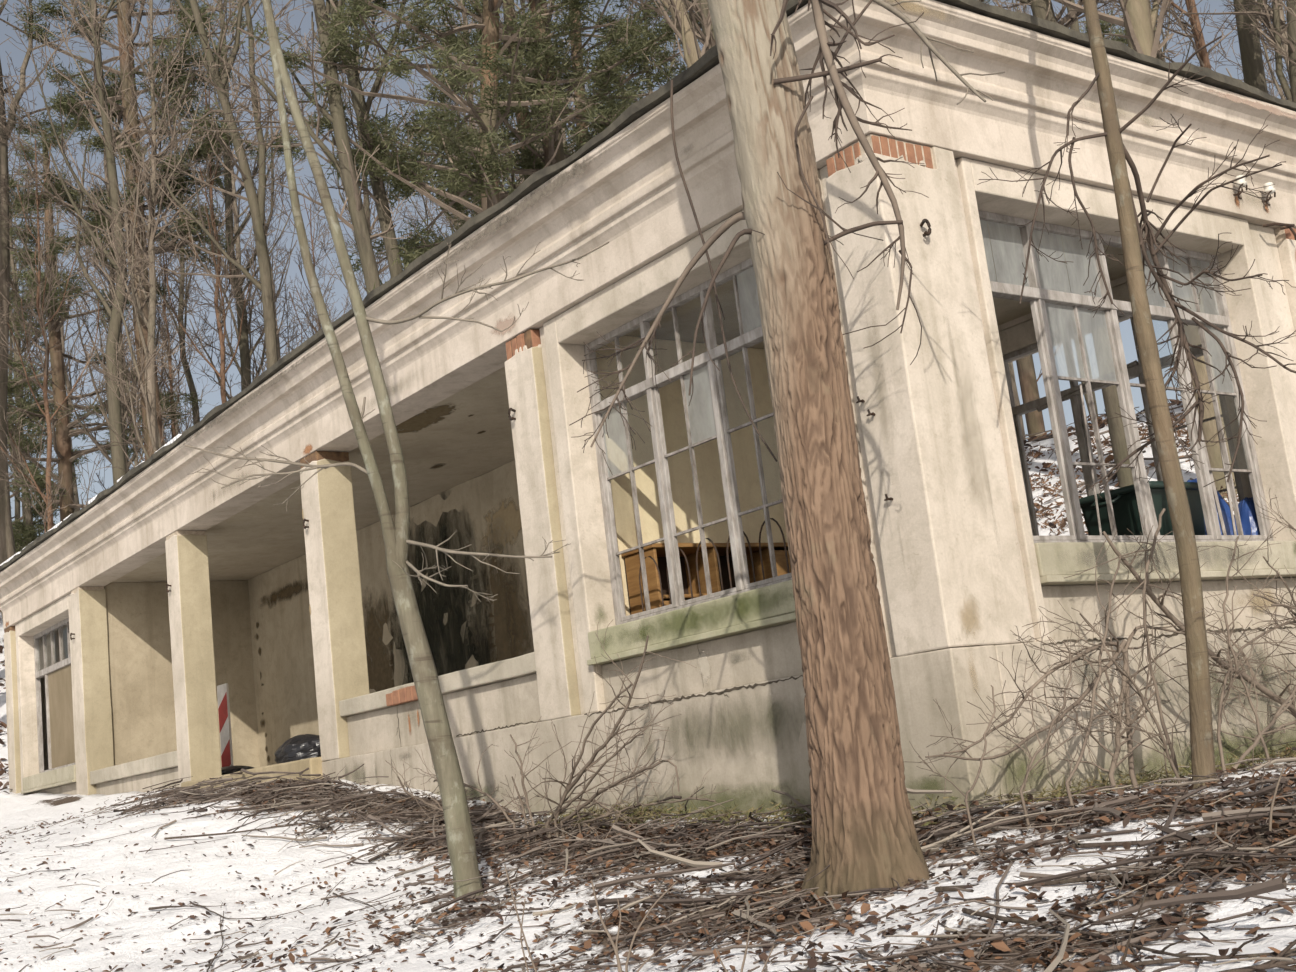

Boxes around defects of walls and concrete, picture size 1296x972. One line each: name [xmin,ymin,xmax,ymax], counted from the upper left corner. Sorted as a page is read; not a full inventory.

spalling [826,134,957,177]
spalling [506,329,541,360]
spalling [384,405,456,435]
spalling [386,685,418,706]
crack [584,645,803,717]
crack [456,721,541,737]